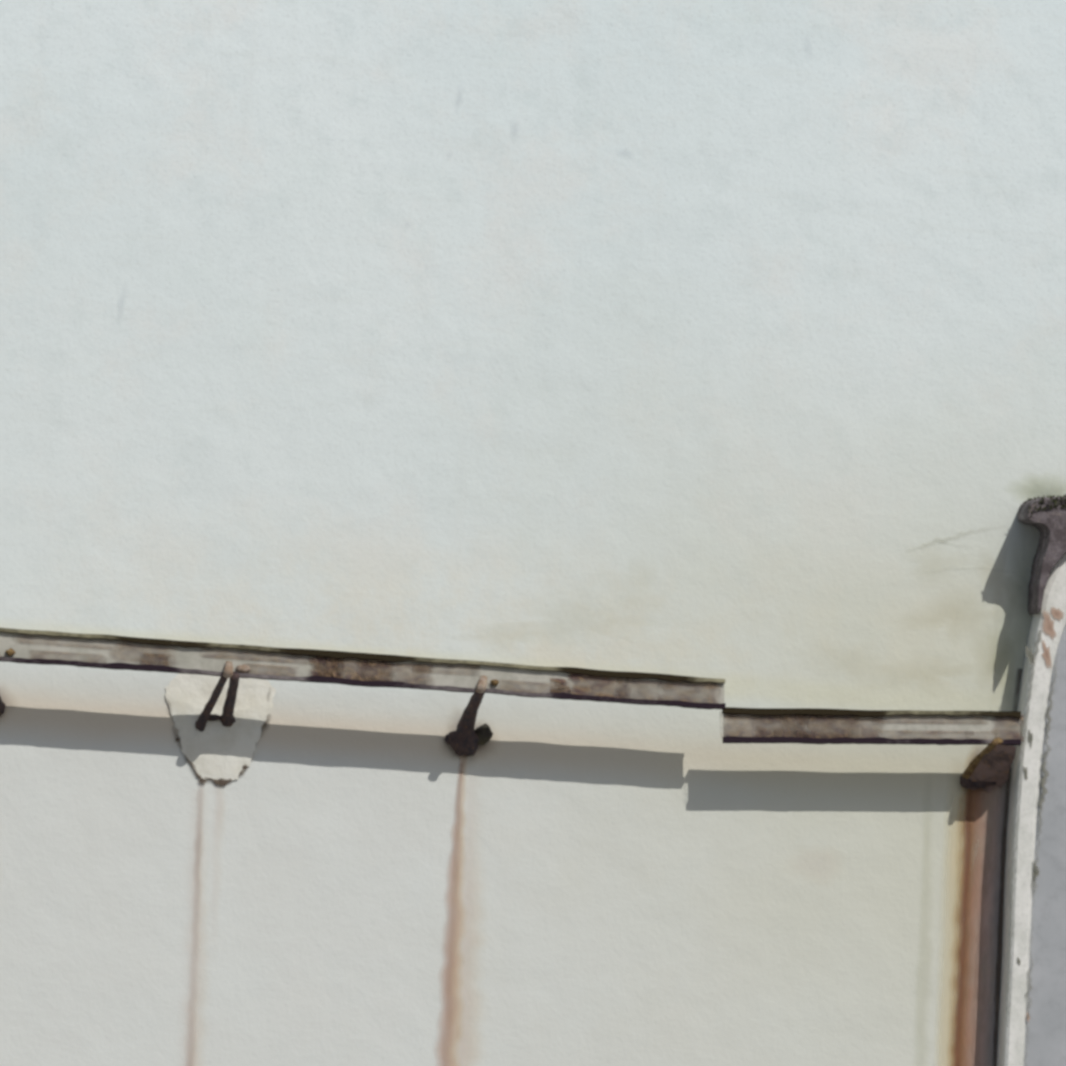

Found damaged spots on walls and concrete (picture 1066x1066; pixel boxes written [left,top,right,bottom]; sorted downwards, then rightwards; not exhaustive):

corrosion [942,770,1010,1066]